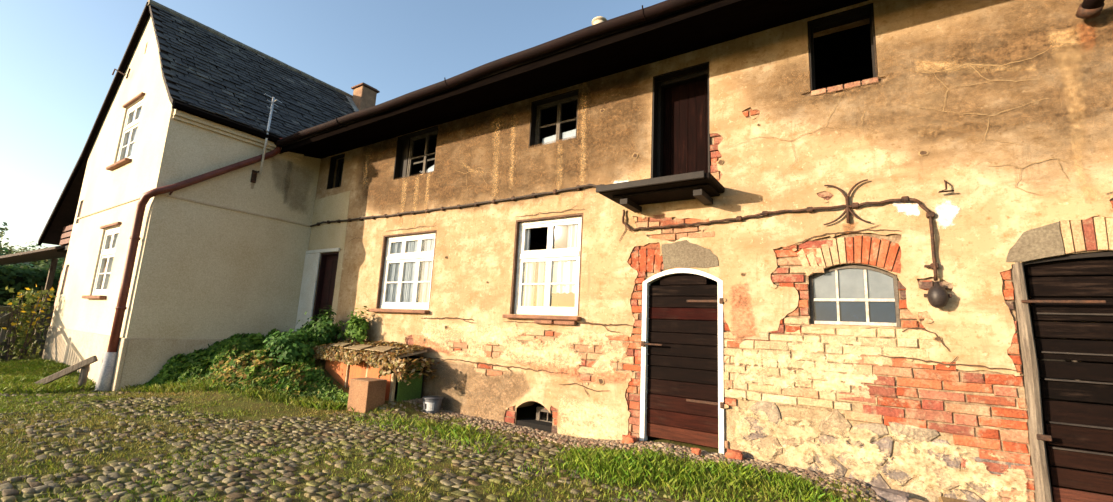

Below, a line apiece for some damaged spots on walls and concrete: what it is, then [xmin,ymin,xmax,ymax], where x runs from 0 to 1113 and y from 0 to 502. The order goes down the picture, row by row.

water stain [361,71,648,211]
flaking render [710,133,724,181]
flaking render [742,108,760,126]
crack [904,50,1088,195]
flaking render [1059,198,1113,255]
flaking render [404,214,715,441]
flaking render [723,233,1036,502]